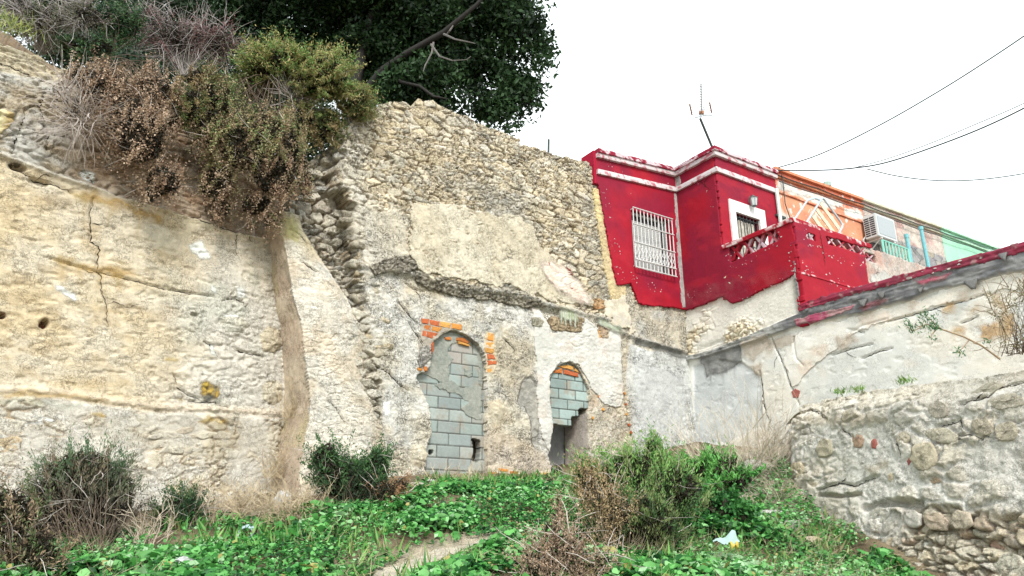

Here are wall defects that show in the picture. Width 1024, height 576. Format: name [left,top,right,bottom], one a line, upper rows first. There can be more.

crack [0,63,252,325]
peeling [369,188,686,451]
crack [761,343,852,437]